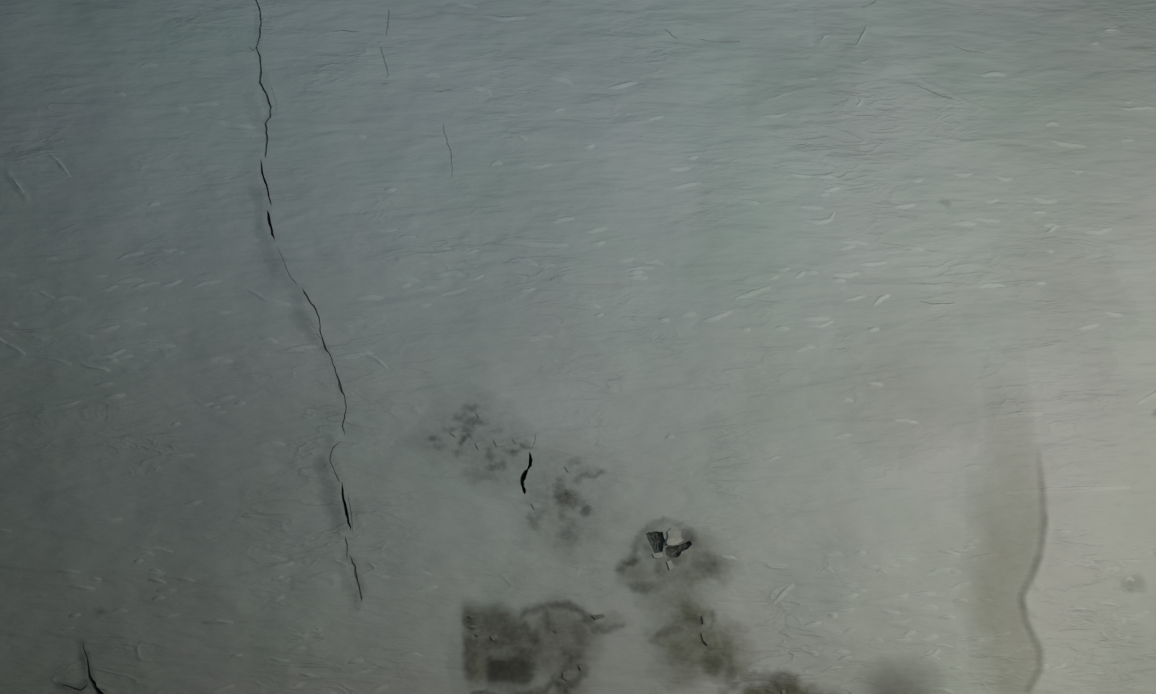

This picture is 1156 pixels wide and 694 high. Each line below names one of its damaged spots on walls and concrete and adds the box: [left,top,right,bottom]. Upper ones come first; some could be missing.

crack [241,0,370,602]
crack [520,434,536,494]
spalling [646,528,692,570]
water stain [1016,511,1055,622]
crack [64,644,103,694]